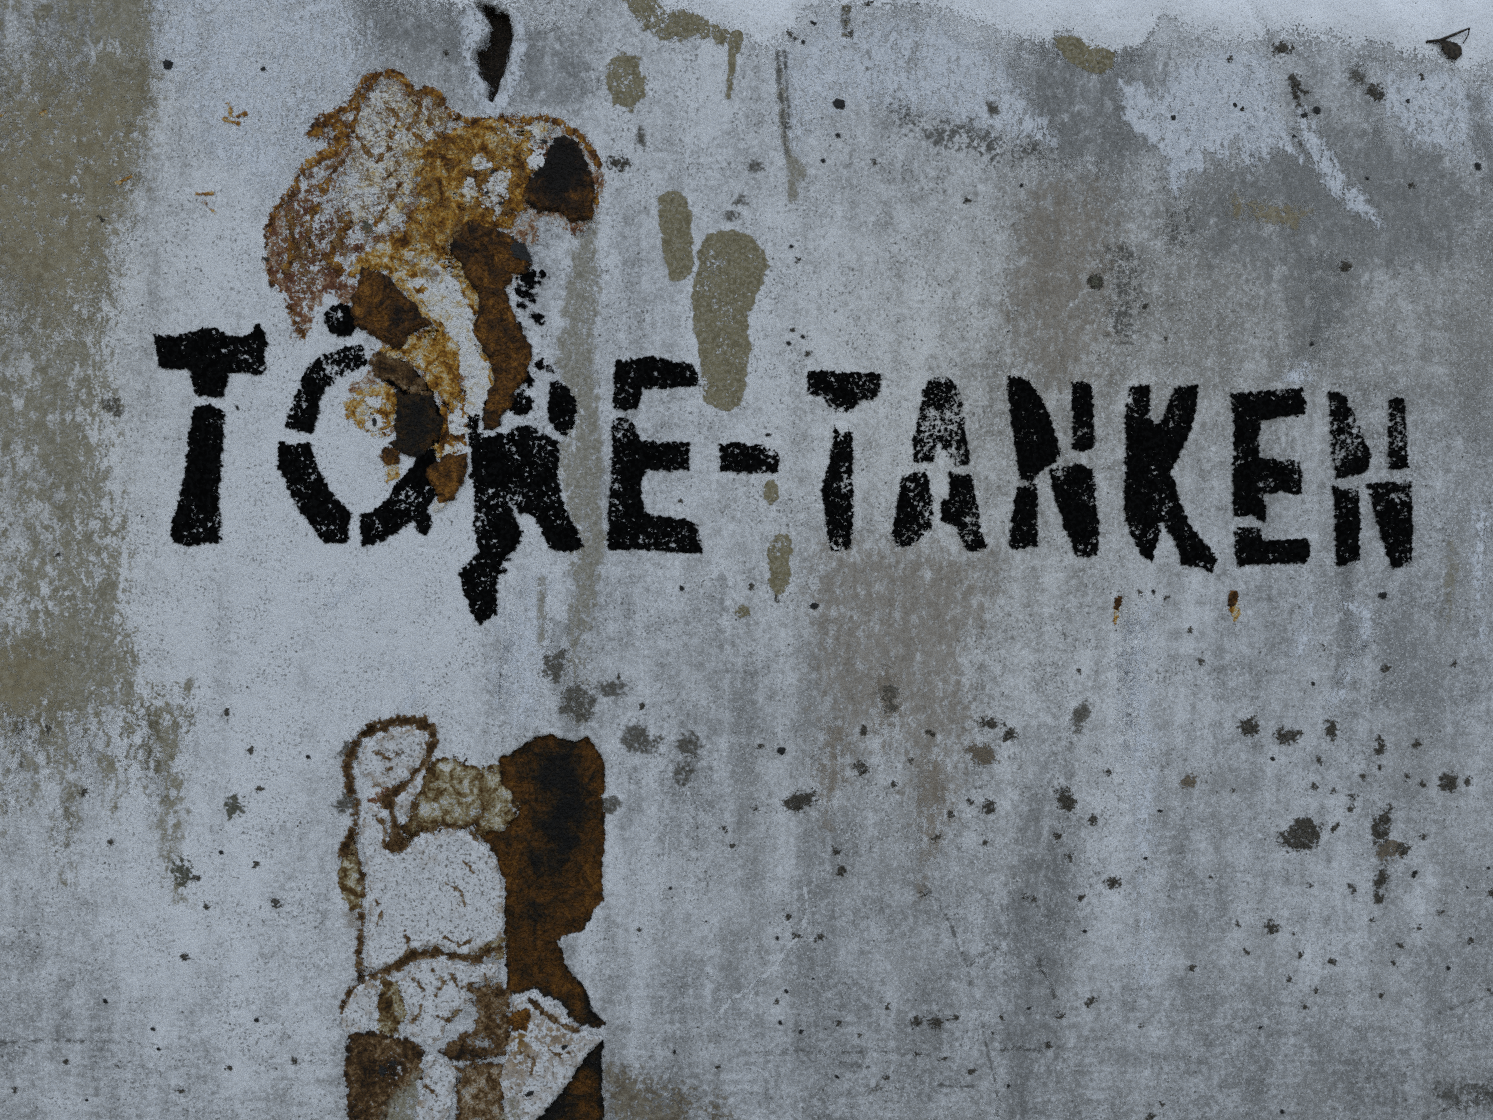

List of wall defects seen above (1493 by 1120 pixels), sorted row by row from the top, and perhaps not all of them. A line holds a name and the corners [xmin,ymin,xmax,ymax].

leakage [605,51,647,112]
leakage [622,0,743,99]
corrosion [262,67,610,512]
leakage [658,191,770,411]
leakage [0,0,385,904]